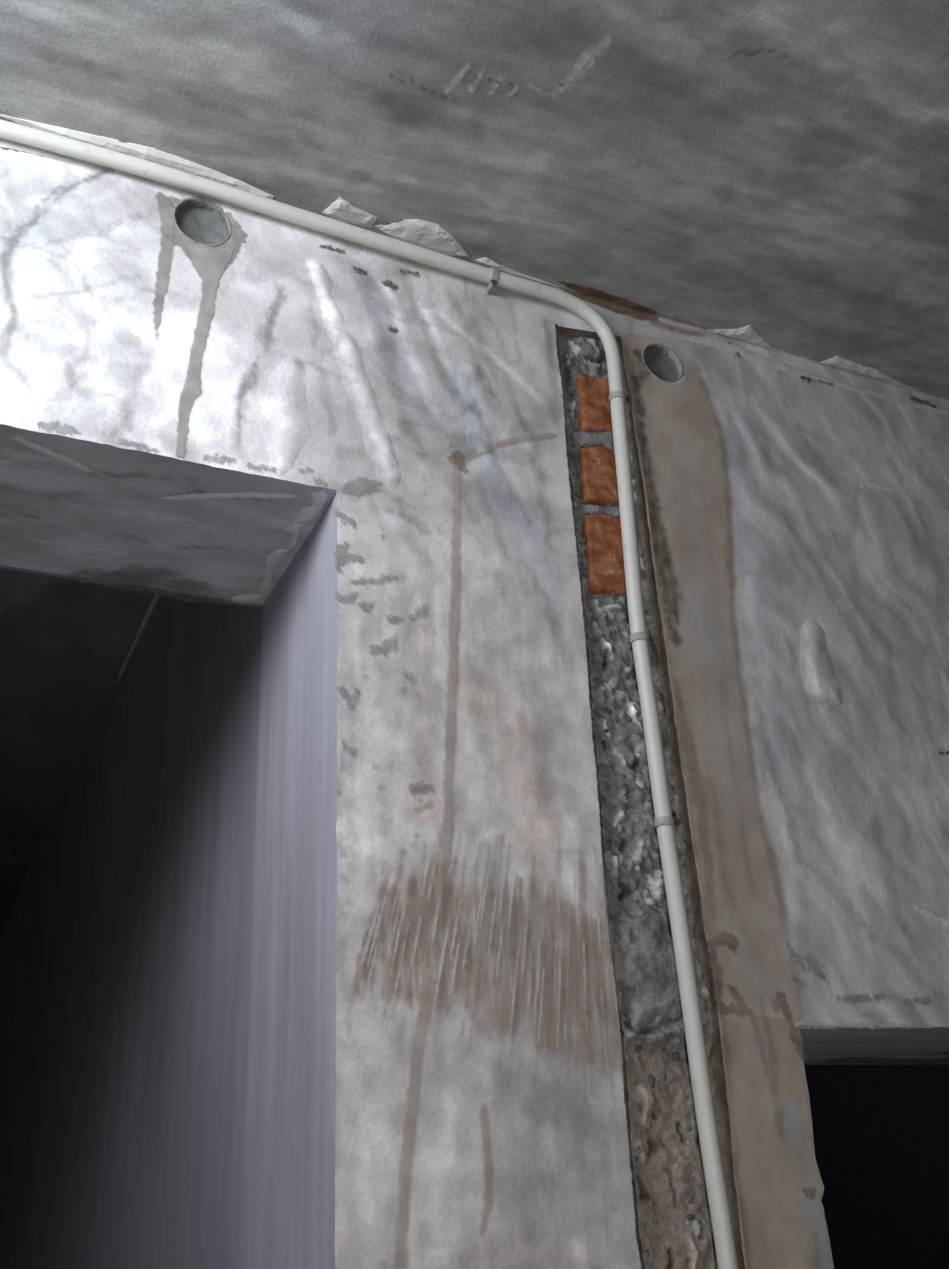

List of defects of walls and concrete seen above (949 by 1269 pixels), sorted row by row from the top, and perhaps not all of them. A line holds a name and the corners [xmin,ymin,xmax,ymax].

peeling [322,197,558,290]
damp [153,192,247,457]
peeling [663,317,936,407]
peeling [37,421,80,434]
peeling [203,453,276,472]
peeling [342,477,383,496]
flaking render [160,468,356,604]
peeling [333,541,398,611]
peeling [369,604,428,655]
spalling [555,324,718,1269]
spalling [629,448,752,1095]
damp [361,857,618,1060]